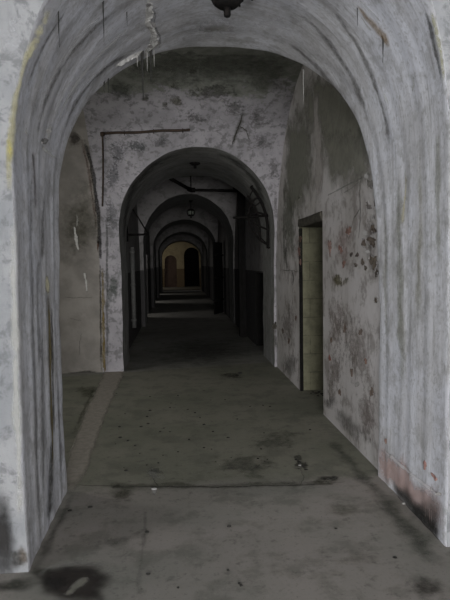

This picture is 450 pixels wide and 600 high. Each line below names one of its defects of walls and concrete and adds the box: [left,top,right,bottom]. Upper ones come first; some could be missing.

flaking render [116,0,160,67]
leakage [324,37,364,104]
leakage [342,23,389,135]
leakage [396,489,436,534]